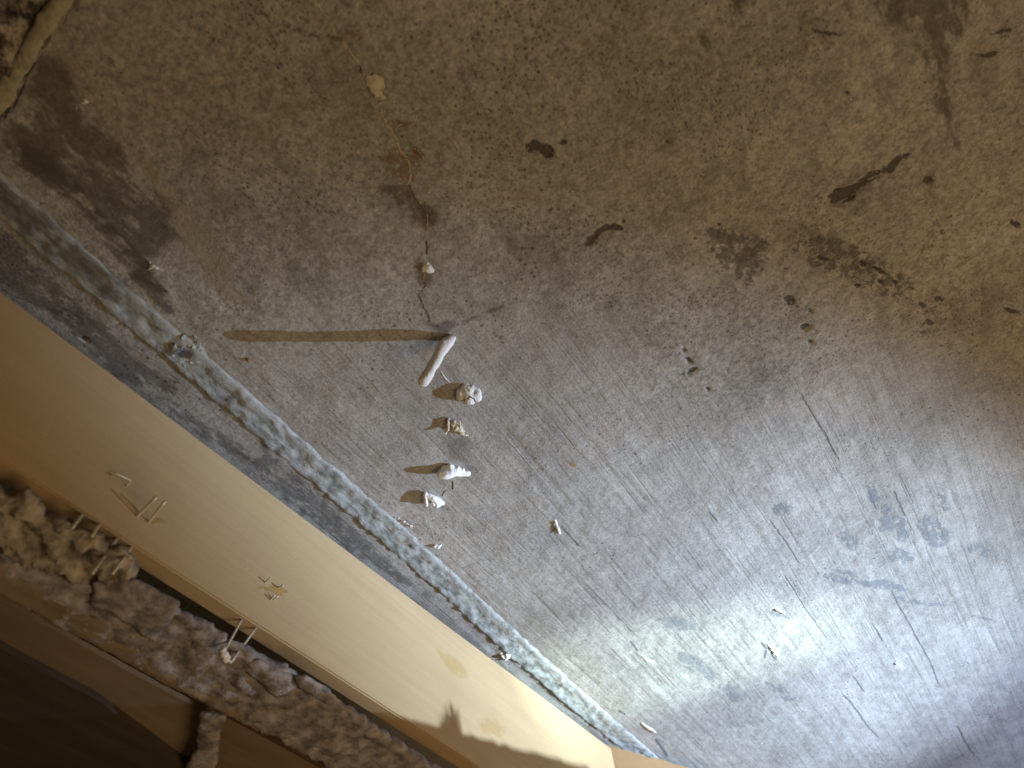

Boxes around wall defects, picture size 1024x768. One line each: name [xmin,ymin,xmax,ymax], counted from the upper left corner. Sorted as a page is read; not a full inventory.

crack [380,107,431,321]